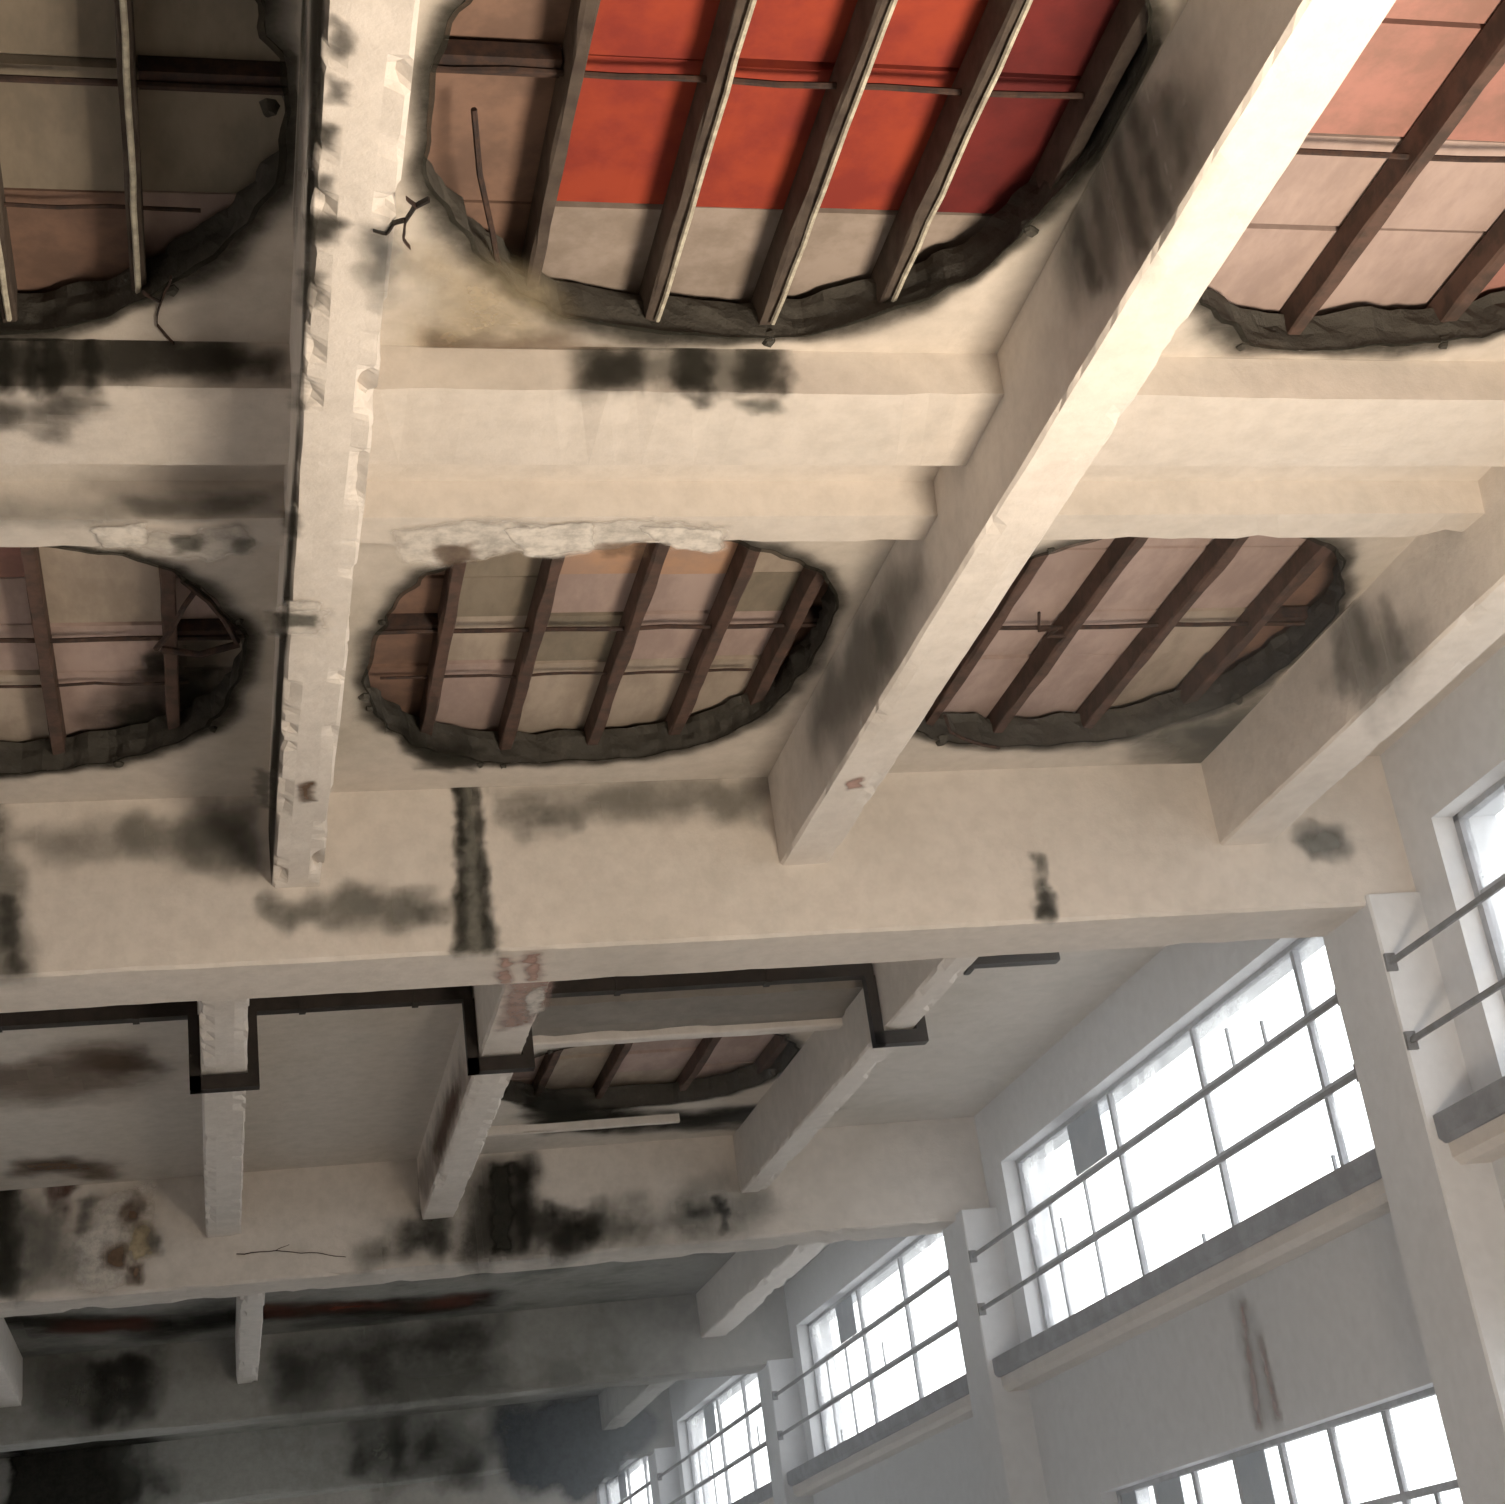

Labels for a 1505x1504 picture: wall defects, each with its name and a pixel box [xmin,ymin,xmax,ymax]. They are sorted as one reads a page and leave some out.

spalling [410,0,1164,348]
spalling [1193,0,1505,356]
leakage [0,339,280,434]
spalling [0,0,351,875]
spalling [355,521,845,769]
hole [913,535,1354,750]
leakage [406,729,482,769]
leakage [451,787,496,956]
spalling [501,1034,802,1110]
leakage [367,1155,636,1266]
leakage [5,1354,161,1504]
leakage [492,1395,658,1503]